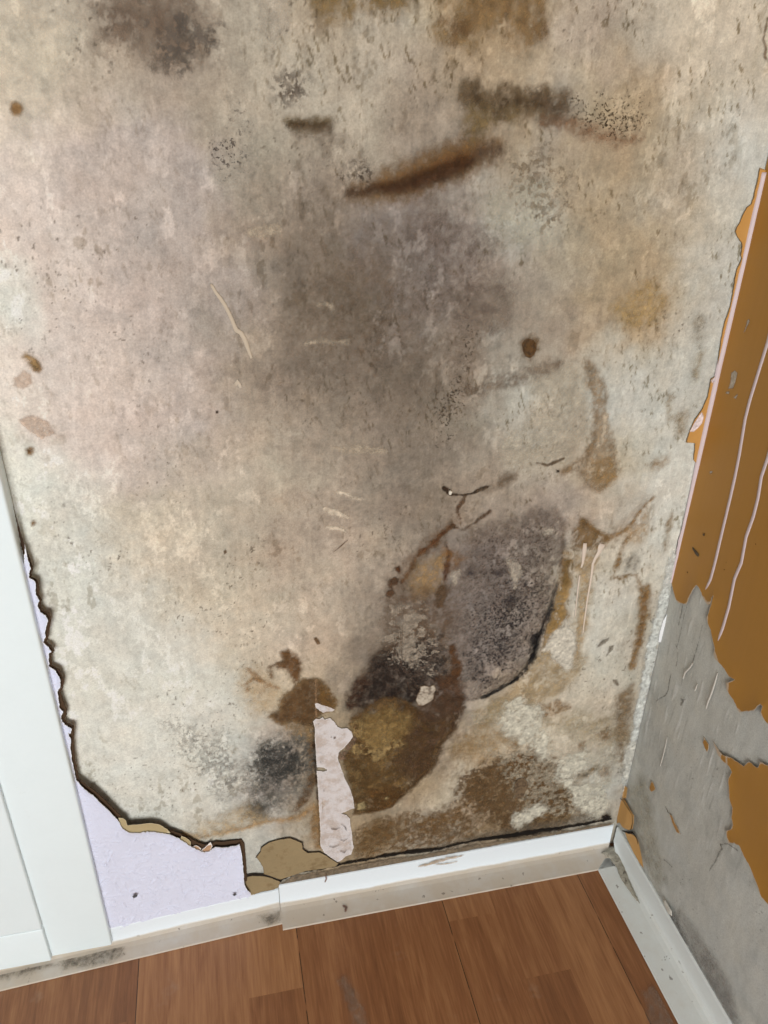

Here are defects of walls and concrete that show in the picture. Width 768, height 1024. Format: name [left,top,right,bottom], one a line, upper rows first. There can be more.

damp [98,0,215,71]
damp [458,80,650,141]
rust [347,139,502,197]
damp [561,362,616,491]
damp [182,498,653,853]
peeling [622,551,676,791]
crack [280,814,611,881]